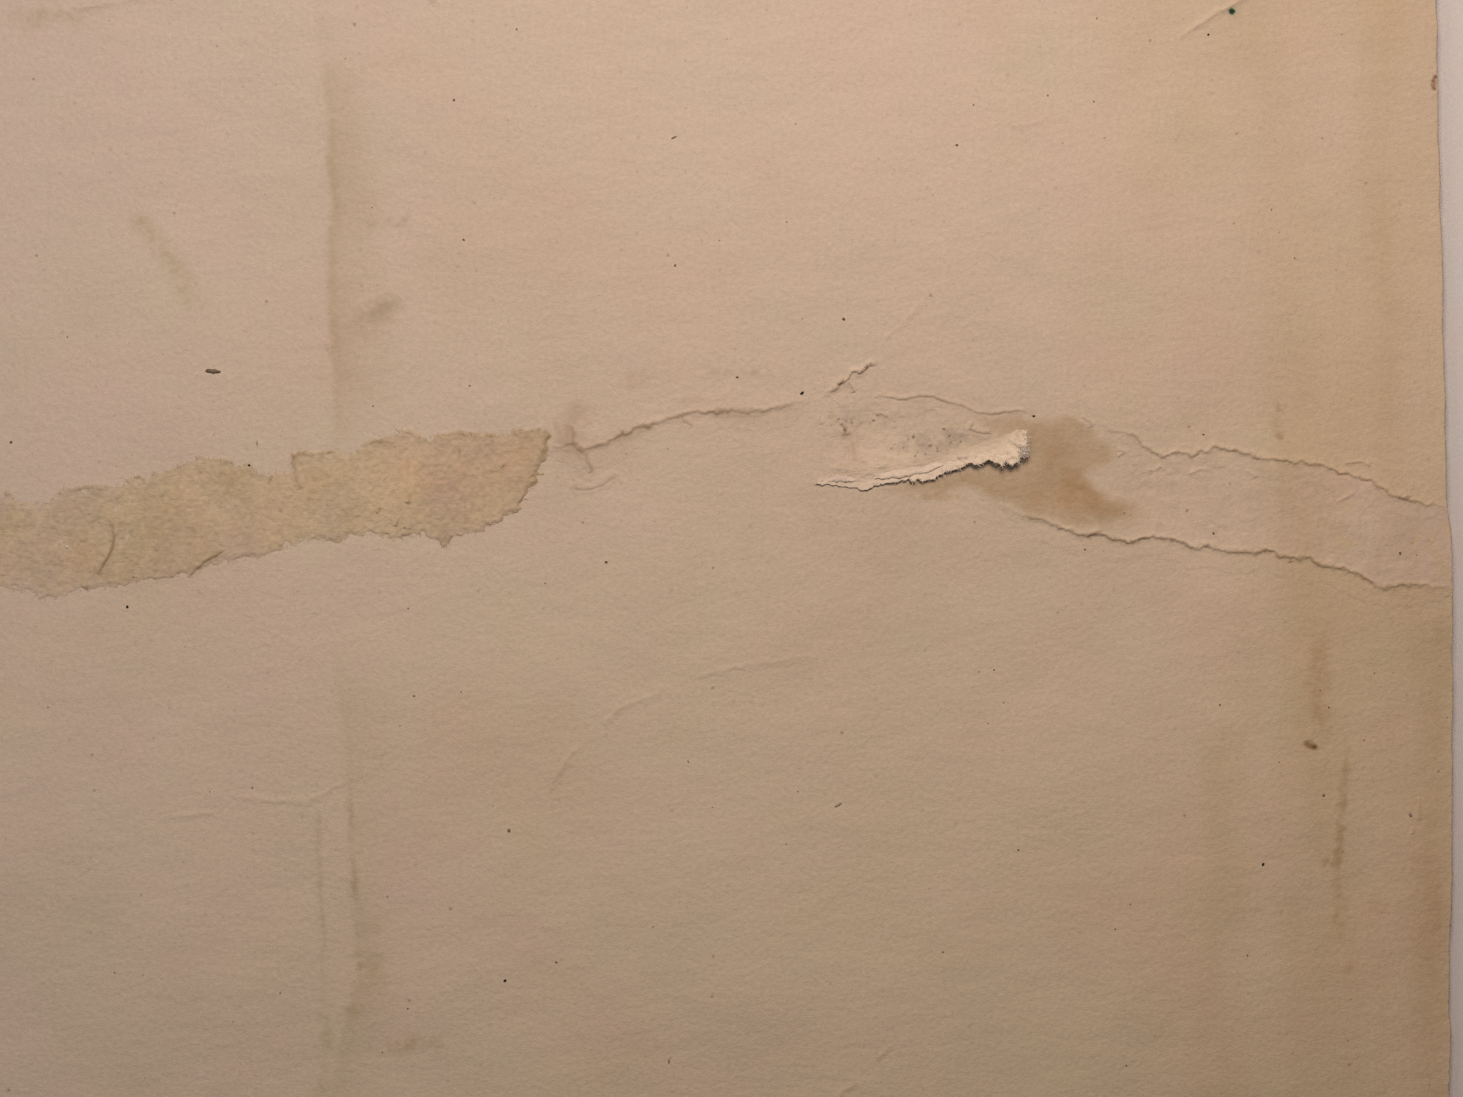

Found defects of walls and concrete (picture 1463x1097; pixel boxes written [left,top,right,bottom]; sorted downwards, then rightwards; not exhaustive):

peeling [0,422,554,601]
leakage [873,406,1152,520]